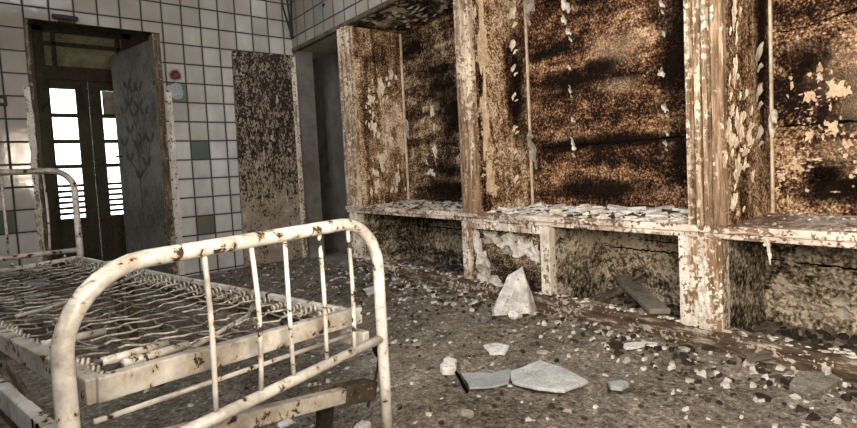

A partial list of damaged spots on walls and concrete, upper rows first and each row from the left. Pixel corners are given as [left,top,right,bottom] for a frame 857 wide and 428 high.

peeling [507,0,535,28]
peeling [561,0,572,42]
damp [545,0,592,10]
crack [773,7,857,33]
peeling [365,69,406,197]
peeling [472,0,499,197]
damp [543,58,617,97]
damp [543,123,687,173]
damp [661,0,686,105]
peeling [723,0,778,216]
peeling [775,62,857,199]
damp [556,180,660,199]